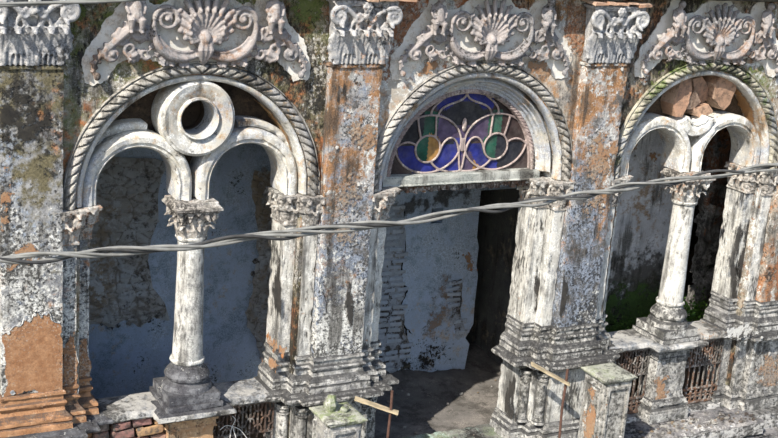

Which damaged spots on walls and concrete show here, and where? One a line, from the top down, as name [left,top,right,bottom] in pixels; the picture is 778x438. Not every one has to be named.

spalling [378,204,413,373]
spalling [446,279,470,340]
peeling [2,310,92,397]